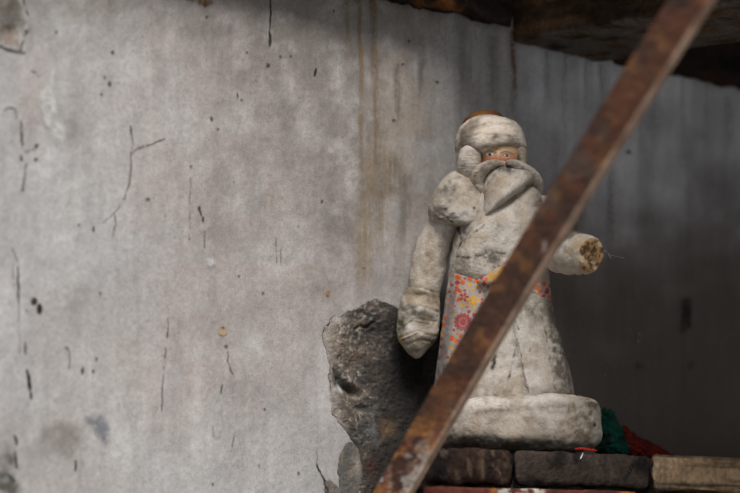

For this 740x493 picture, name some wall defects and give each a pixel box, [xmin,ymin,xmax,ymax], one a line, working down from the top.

crack [266,0,274,46]